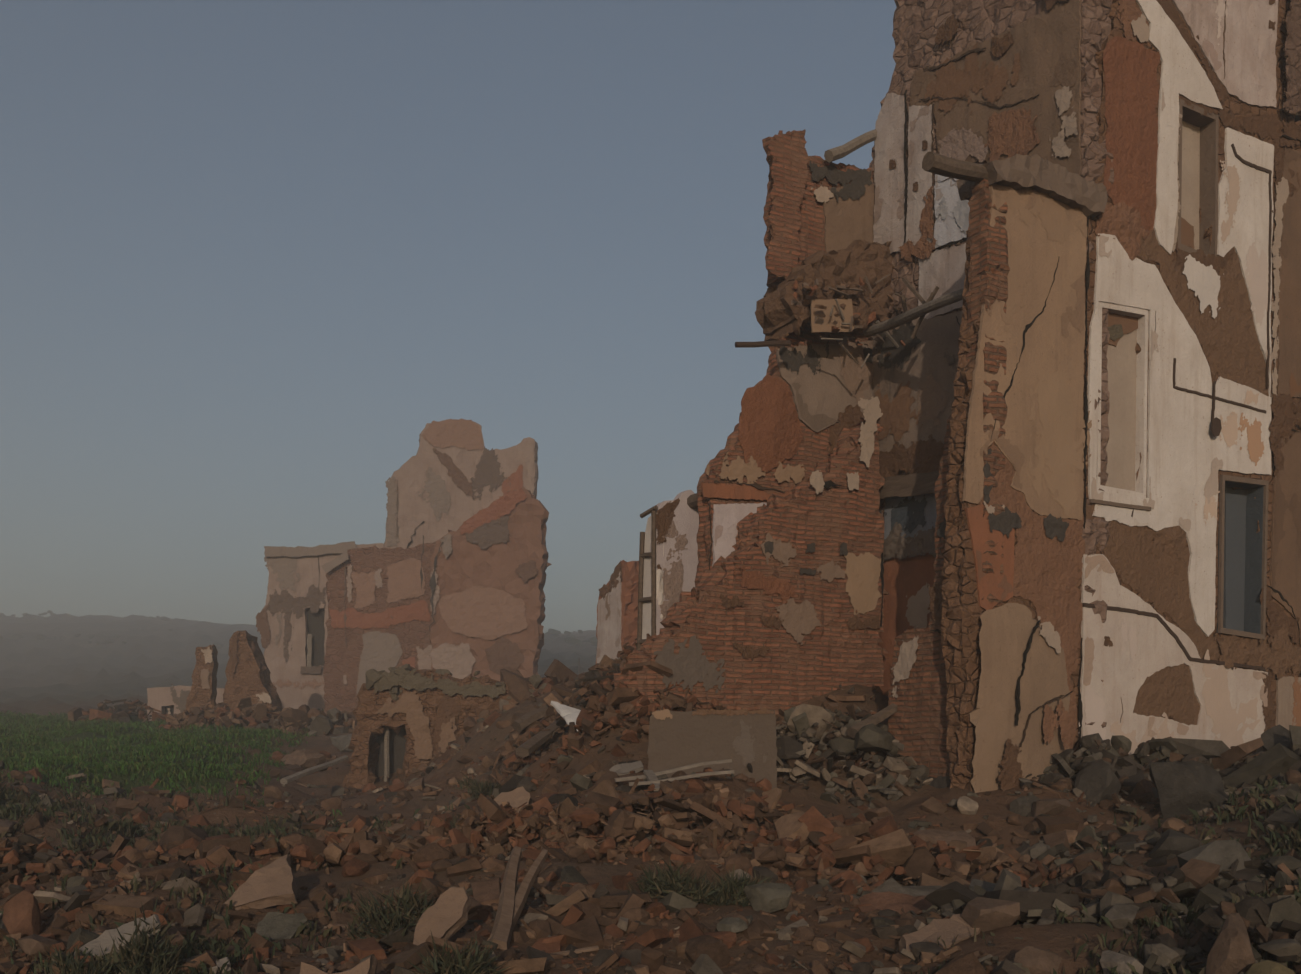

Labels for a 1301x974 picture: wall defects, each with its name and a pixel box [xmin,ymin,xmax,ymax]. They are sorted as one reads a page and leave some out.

spalling [1103,0,1301,476]
crack [991,216,1090,528]
flaking render [810,470,825,494]
flaking render [800,542,884,615]
peeling [879,494,946,539]
flaking render [891,577,943,698]
crack [1015,620,1083,747]
spalling [980,443,1267,749]